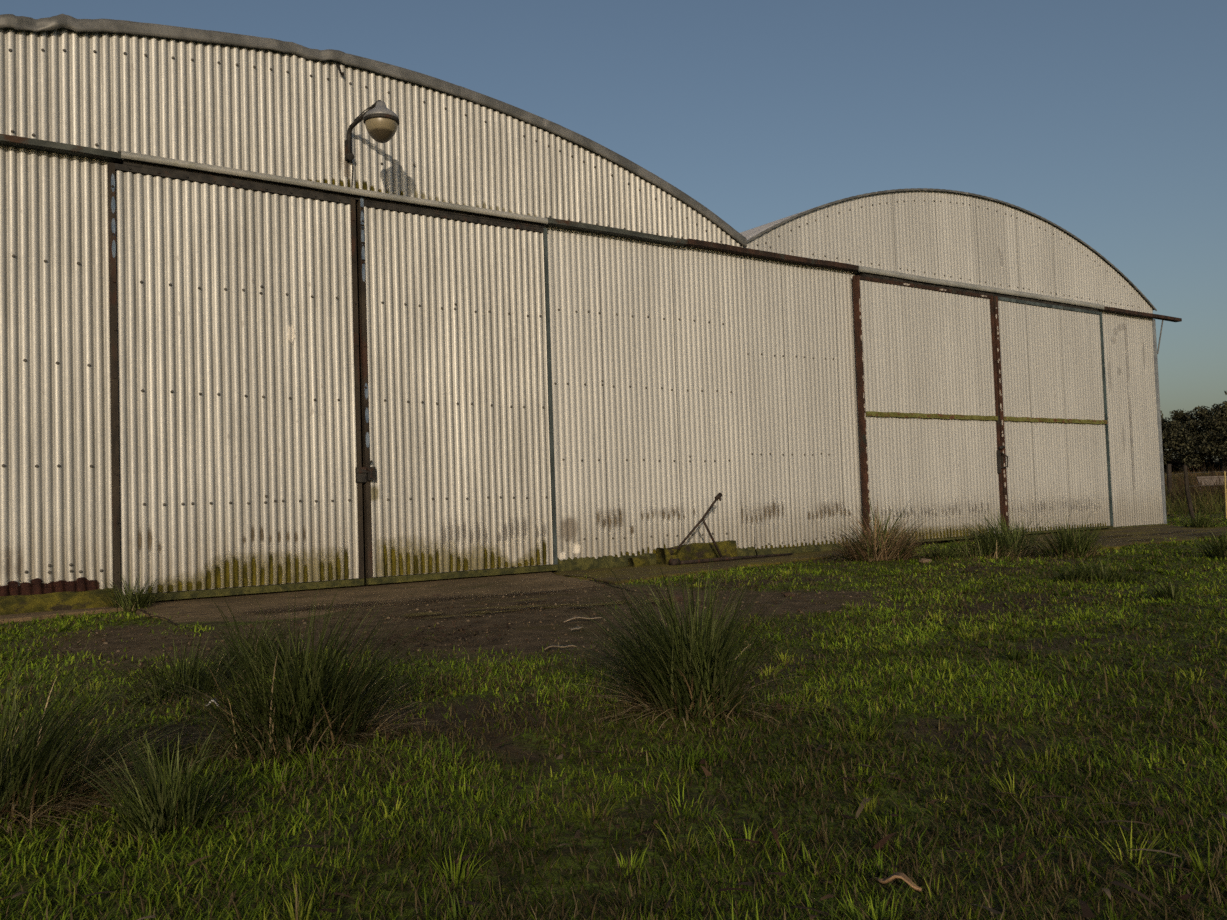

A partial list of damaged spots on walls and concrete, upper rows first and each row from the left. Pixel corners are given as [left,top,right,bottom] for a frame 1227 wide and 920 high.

leakage [871,504,989,519]
leakage [597,510,695,533]
leakage [138,531,161,550]
leakage [243,528,305,542]
corrosion [0,577,99,596]